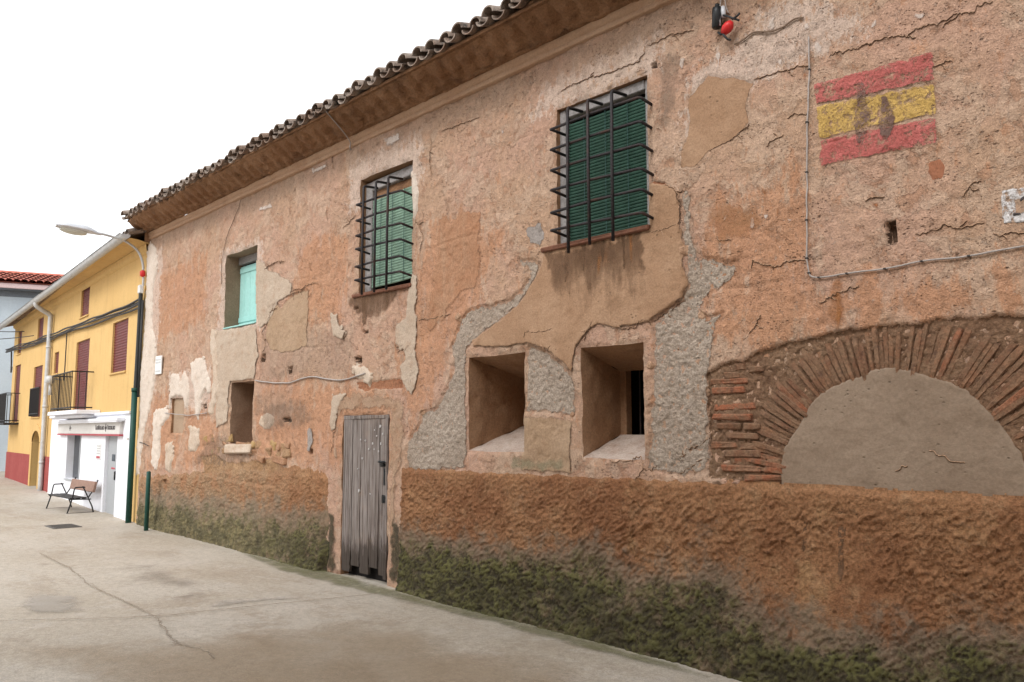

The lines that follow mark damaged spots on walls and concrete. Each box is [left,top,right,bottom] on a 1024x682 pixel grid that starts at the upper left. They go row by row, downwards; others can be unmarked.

crack [561,30,694,92]
crack [754,1,993,80]
crack [915,180,1024,240]
damp [545,232,643,287]
crack [751,259,806,268]
flaking render [136,241,219,476]
flaking render [330,313,347,339]
flaking render [352,274,419,395]
spalling [407,260,538,470]
spalling [647,191,1024,484]